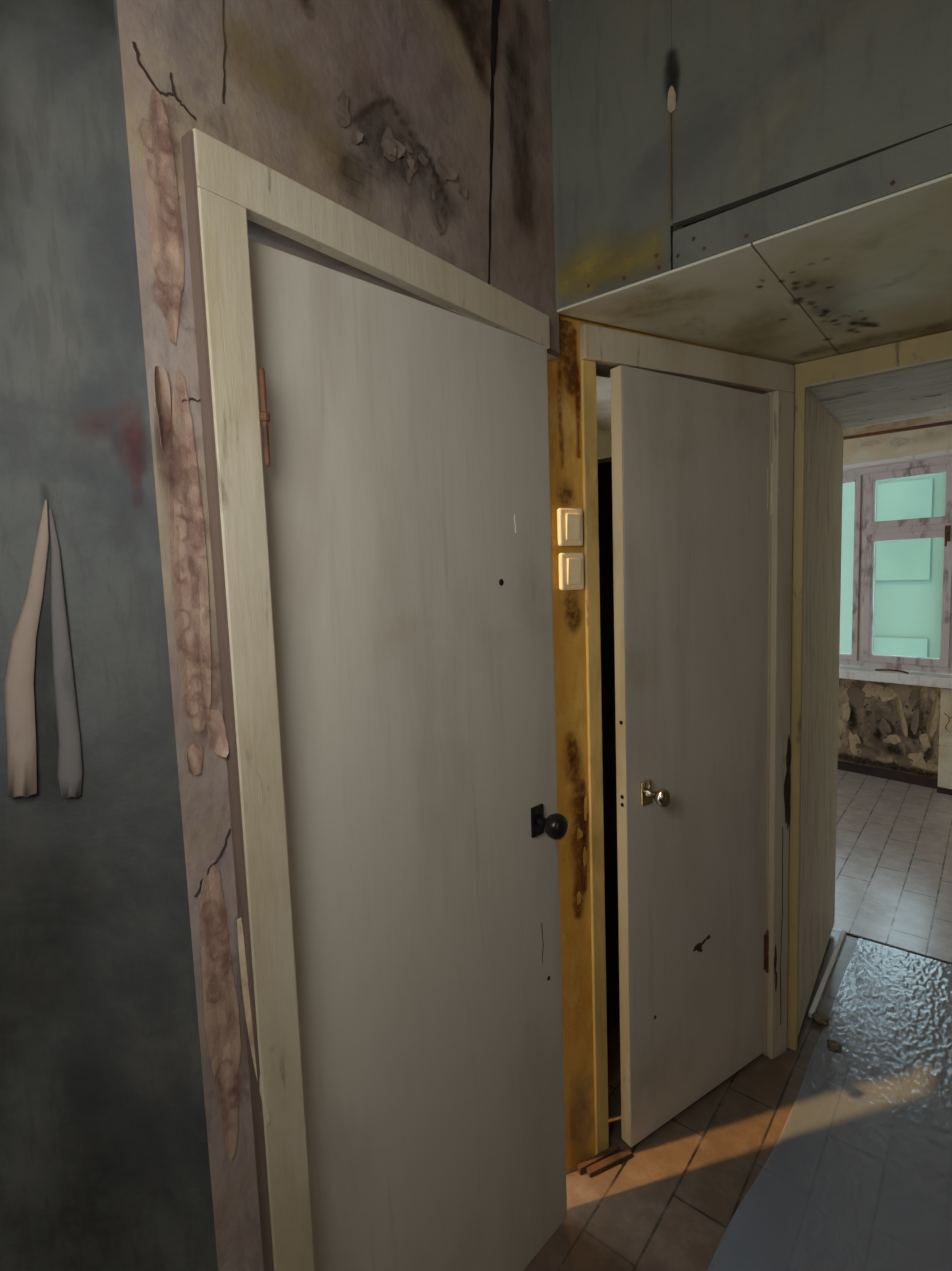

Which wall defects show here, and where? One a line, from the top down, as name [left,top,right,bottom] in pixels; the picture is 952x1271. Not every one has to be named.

crack [488,0,500,285]
water stain [780,271,877,347]
peeling [186,709,229,775]
flaking render [842,682,940,773]